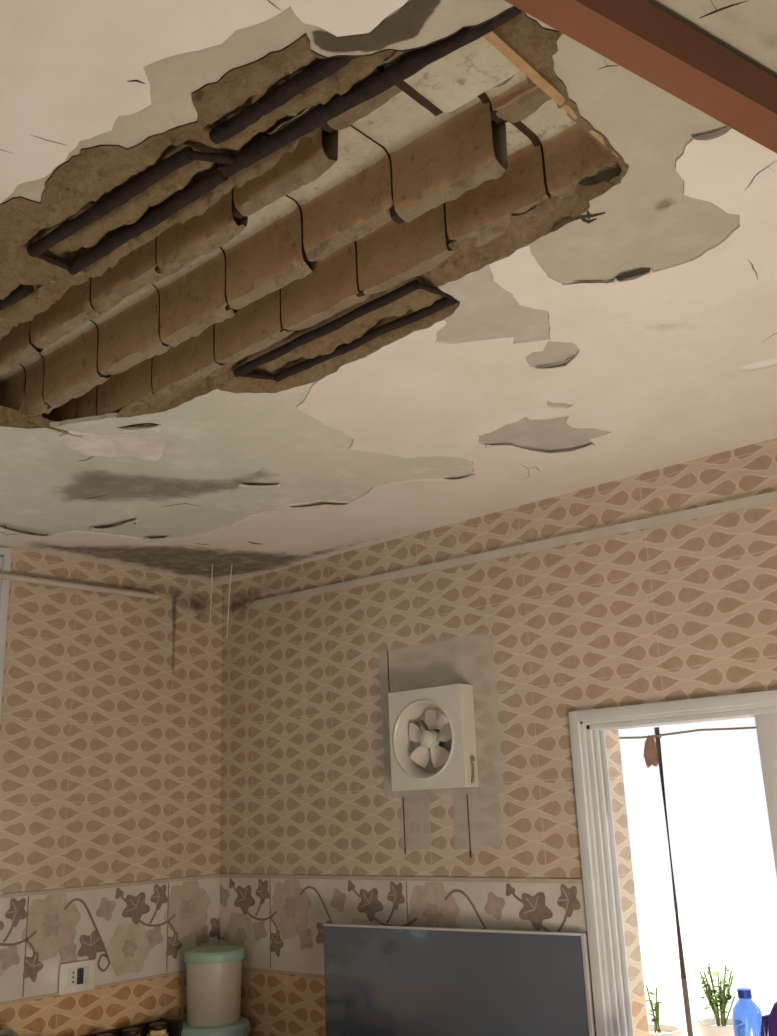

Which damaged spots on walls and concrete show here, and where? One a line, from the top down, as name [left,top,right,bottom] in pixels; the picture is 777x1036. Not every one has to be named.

peeling [645,0,777,79]
spalling [0,0,740,543]
water stain [50,546,296,577]